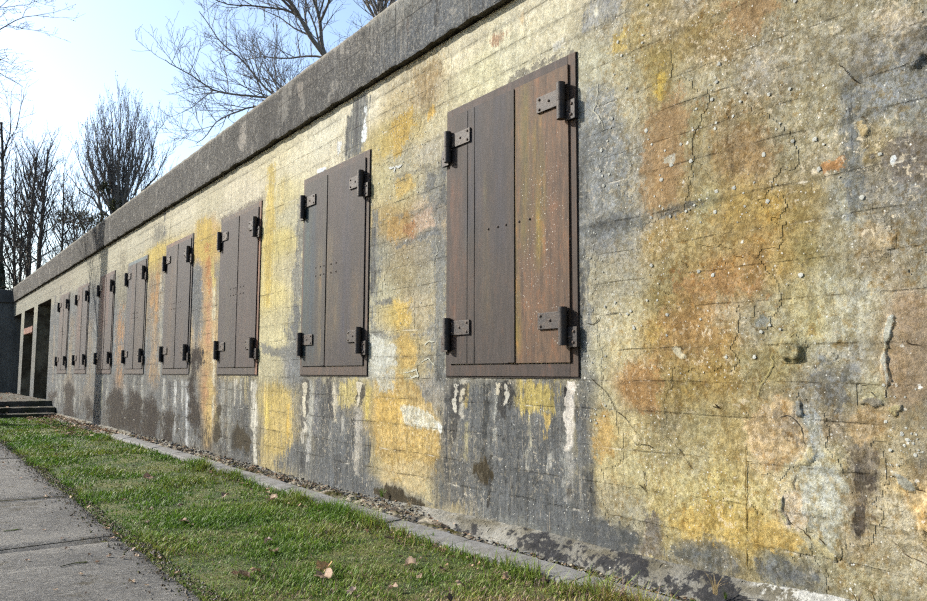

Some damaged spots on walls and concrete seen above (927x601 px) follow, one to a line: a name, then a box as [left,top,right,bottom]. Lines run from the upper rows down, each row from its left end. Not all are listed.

water stain [90,287,99,324]
water stain [115,210,173,392]
water stain [190,260,201,348]
water stain [214,0,828,594]
water stain [76,364,124,424]
water stain [160,363,203,450]
water stain [796,352,889,547]